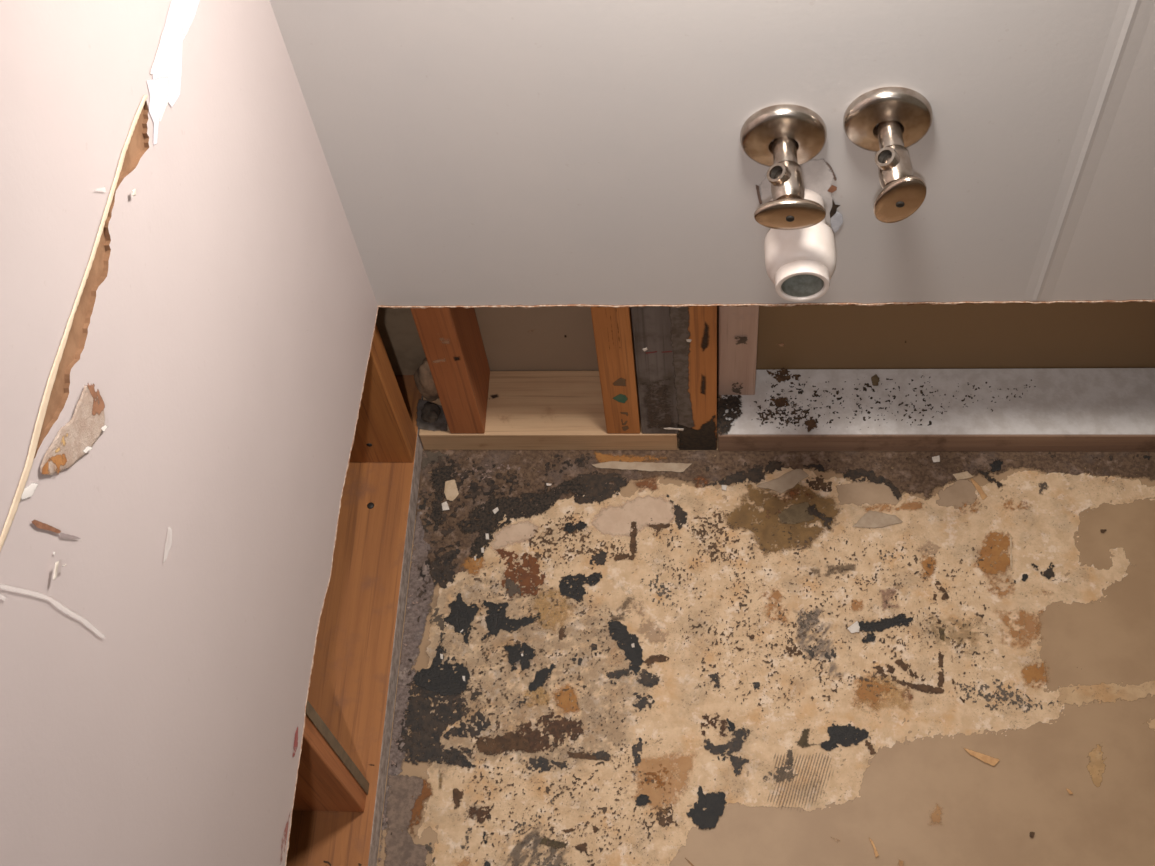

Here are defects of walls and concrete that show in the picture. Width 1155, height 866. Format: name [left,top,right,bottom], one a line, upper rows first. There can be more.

mould [716,368,1036,435]
peeling [442,480,459,510]
peeling [491,521,538,549]
peeling [592,495,676,537]
spalling [757,469,808,493]
peeling [837,480,902,528]
peeling [936,471,988,509]
peeling [639,604,665,642]
damp [391,451,1058,866]